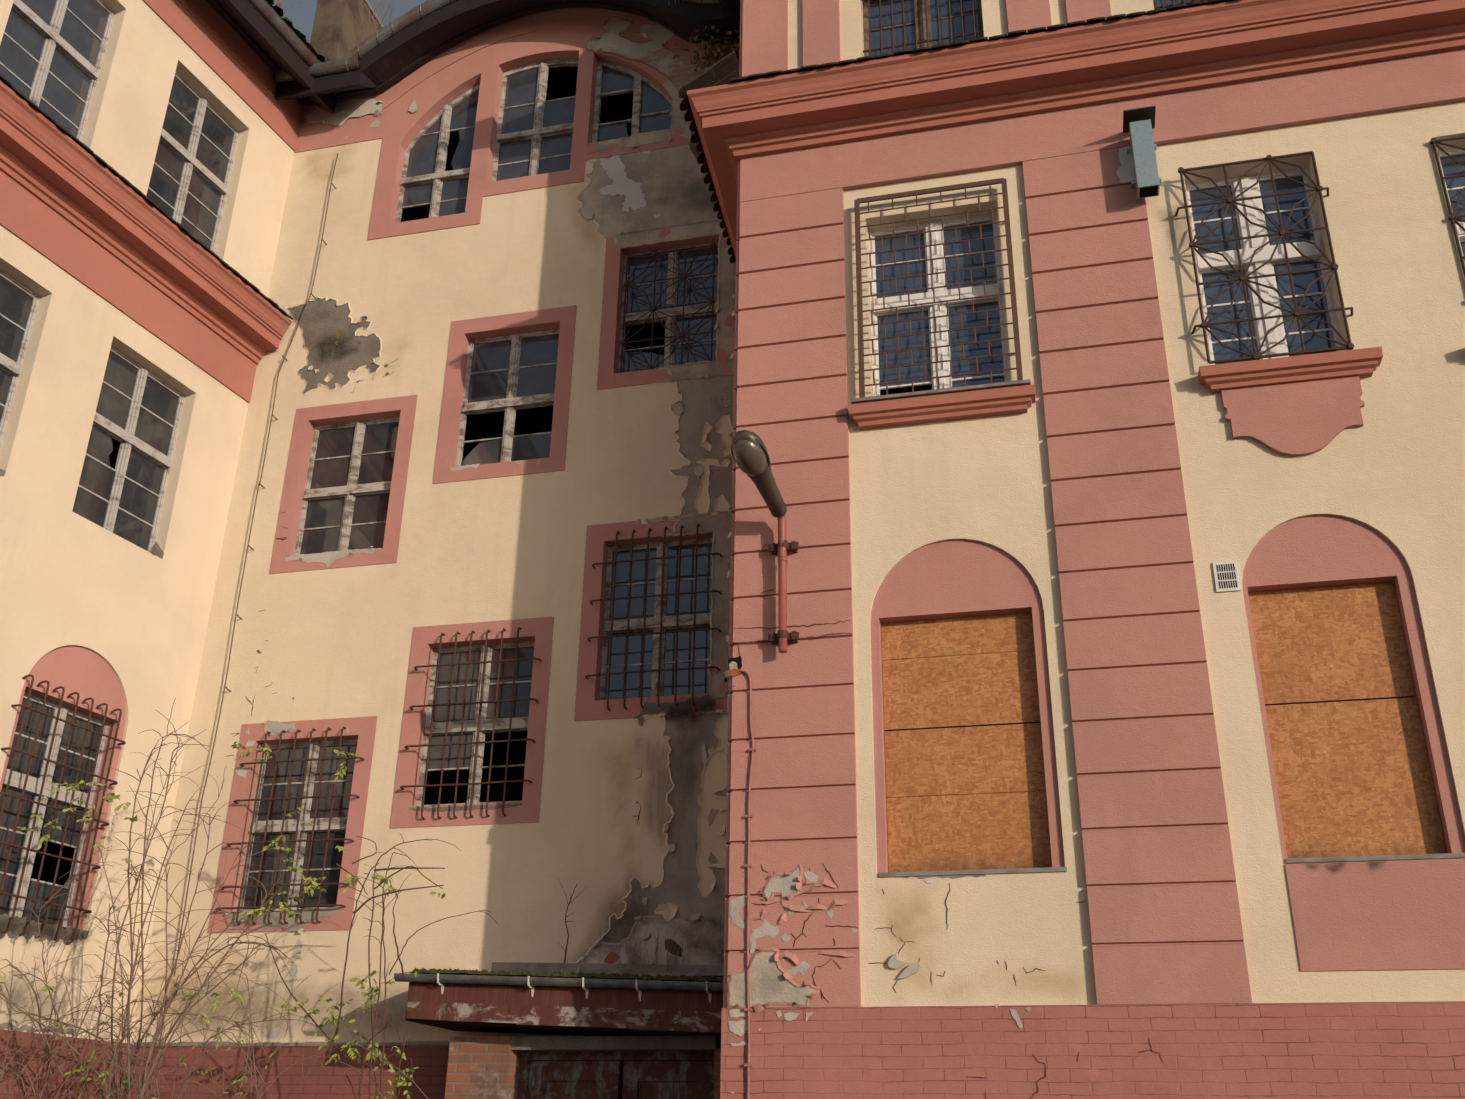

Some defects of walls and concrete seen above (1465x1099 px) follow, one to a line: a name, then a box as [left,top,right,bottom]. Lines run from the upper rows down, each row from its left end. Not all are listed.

peeling [287,296,396,396]
peeling [561,17,834,1047]
crack [729,589,852,690]